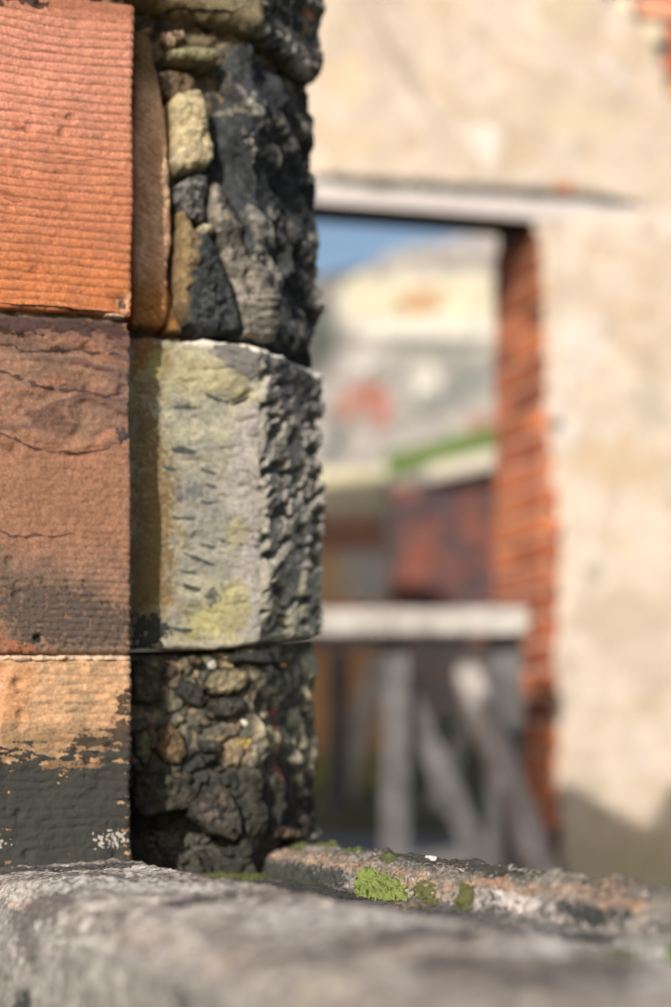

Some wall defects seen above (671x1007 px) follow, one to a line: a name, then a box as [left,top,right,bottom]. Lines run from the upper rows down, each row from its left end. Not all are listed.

crack [163,5,247,14]
leakage [0,573,172,654]
leakage [0,685,147,926]
crack [250,928,504,965]
leakage [13,986,33,1007]